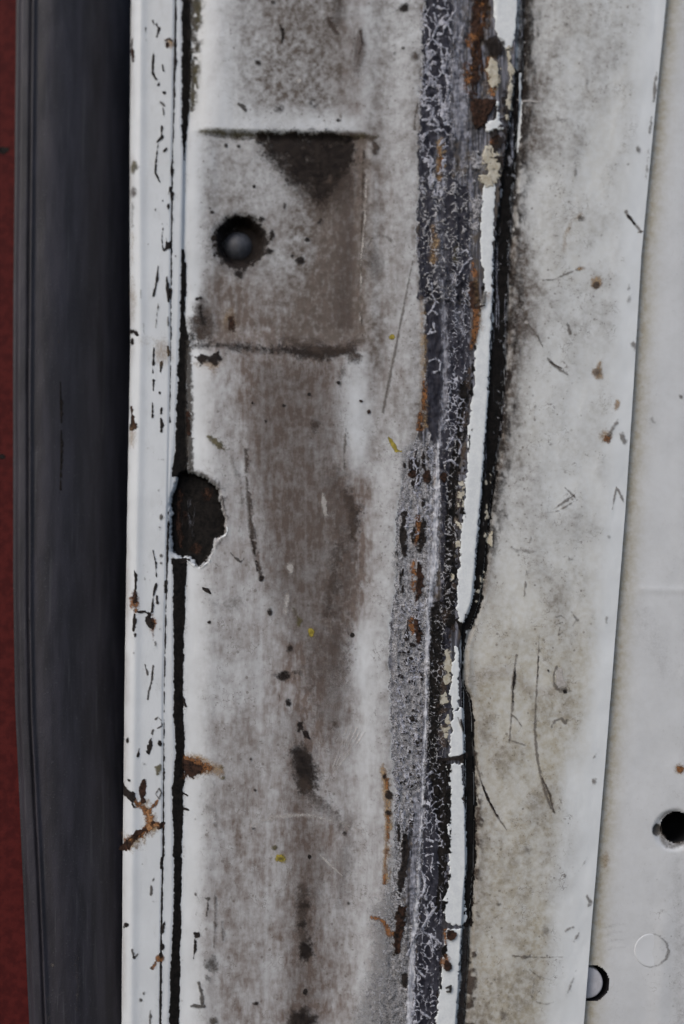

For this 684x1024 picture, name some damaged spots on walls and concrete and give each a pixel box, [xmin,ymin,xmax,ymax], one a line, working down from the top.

corrosion [463,0,505,130]
peeling [151,54,167,182]
damp [201,128,379,206]
peeling [152,266,172,326]
peeling [151,346,170,432]
peeling [132,472,228,637]
corrosion [399,511,427,602]
corrosion [408,617,424,644]
peeling [126,717,163,757]
corrosion [183,755,225,779]
corrosion [119,779,165,851]
corrosion [370,764,411,956]